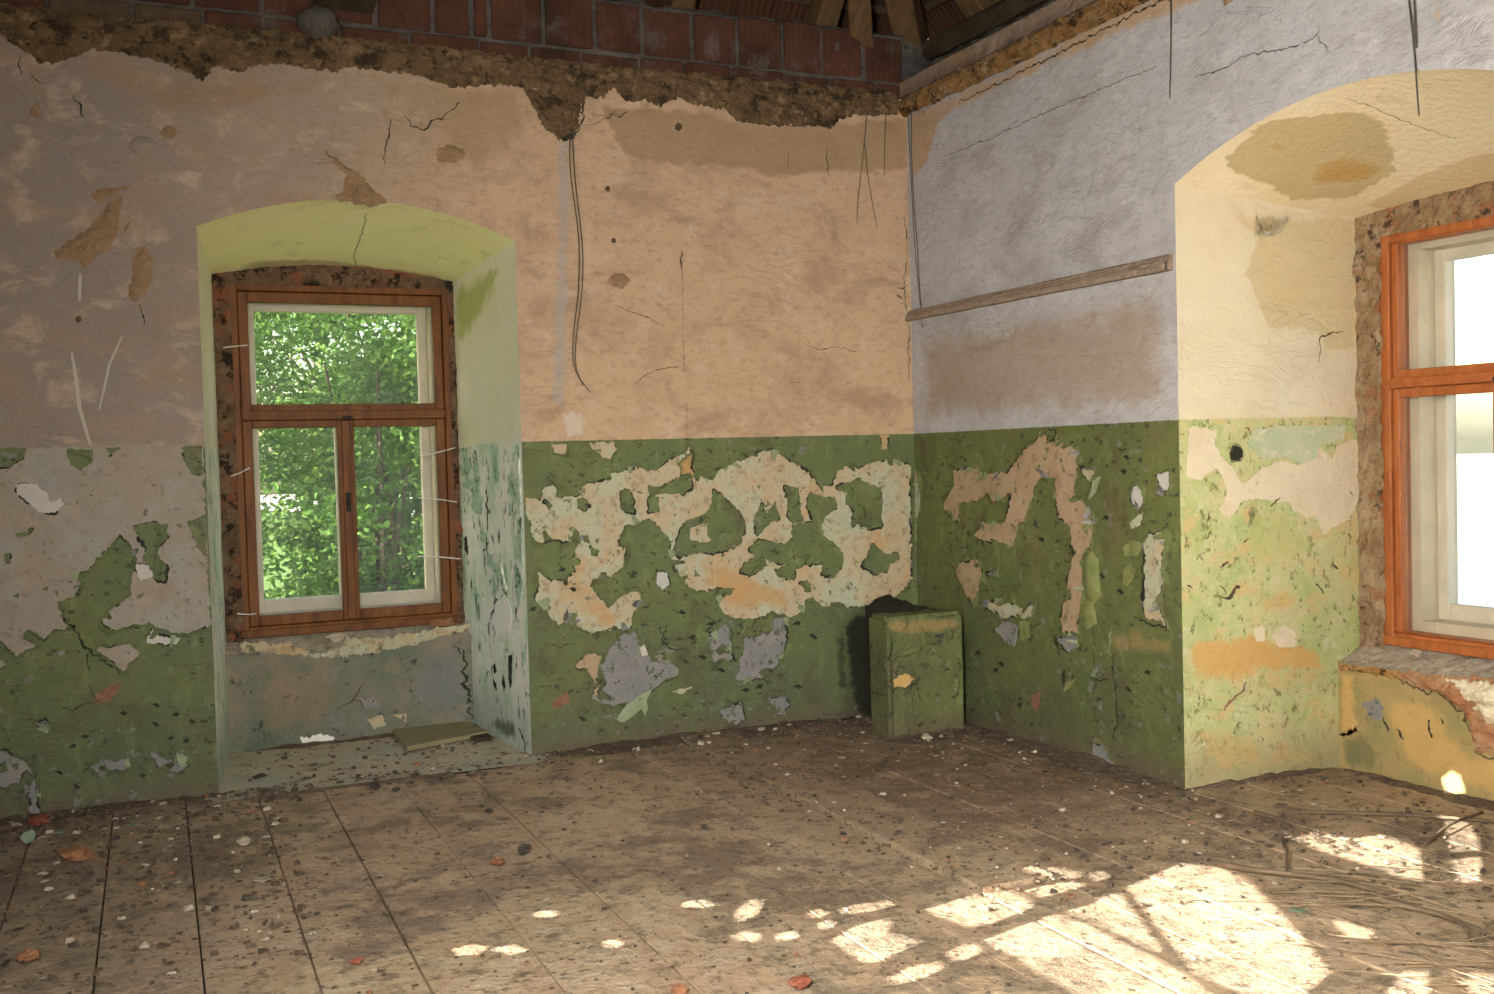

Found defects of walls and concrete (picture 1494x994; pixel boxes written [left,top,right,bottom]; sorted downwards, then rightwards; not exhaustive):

spalling [0,2,900,142]
spalling [54,186,131,268]
spalling [128,247,155,303]
spalling [324,150,386,208]
leakage [1221,110,1494,355]
peeling [459,445,483,516]
peeling [942,331,1359,692]
peeling [0,444,212,716]
peeling [464,434,922,729]
peeling [240,624,517,743]
spalling [1338,663,1494,760]